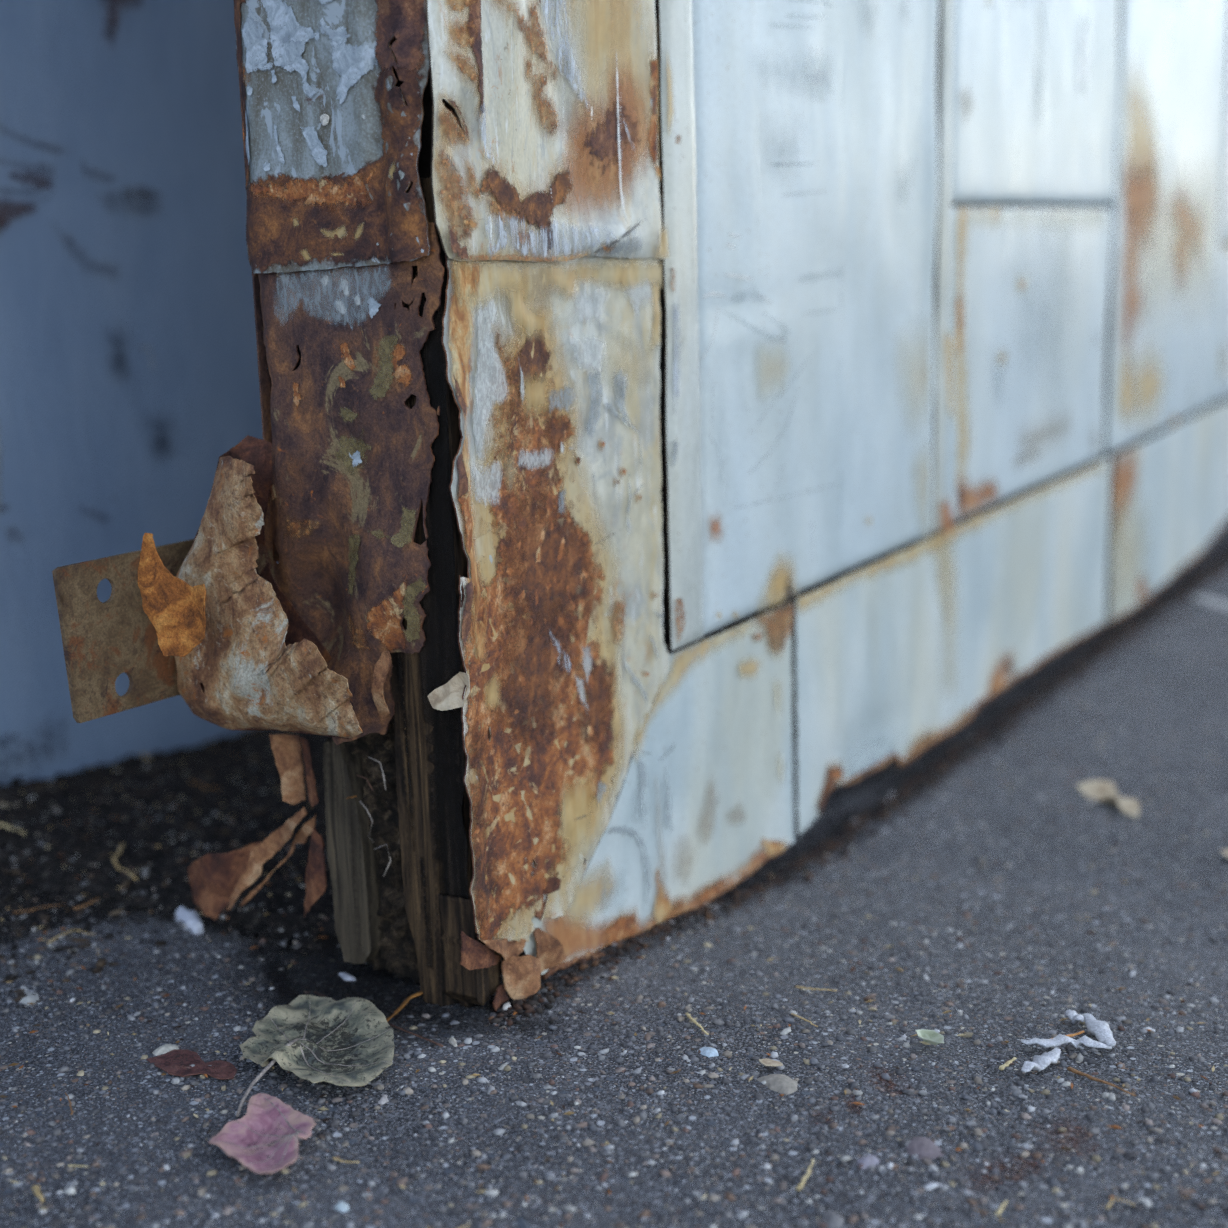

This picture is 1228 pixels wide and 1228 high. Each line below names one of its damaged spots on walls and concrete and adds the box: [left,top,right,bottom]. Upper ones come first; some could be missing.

peeling [241,0,377,171]
corrosion [234,0,429,273]
corrosion [1123,96,1158,333]
corrosion [1174,196,1200,284]
corrosion [338,342,356,388]
corrosion [390,344,411,386]
peeling [334,407,372,475]
corrosion [437,0,787,980]
corrosion [138,533,206,657]
corrosion [348,582,407,651]
peeling [348,507,416,595]
peeling [402,577,426,642]